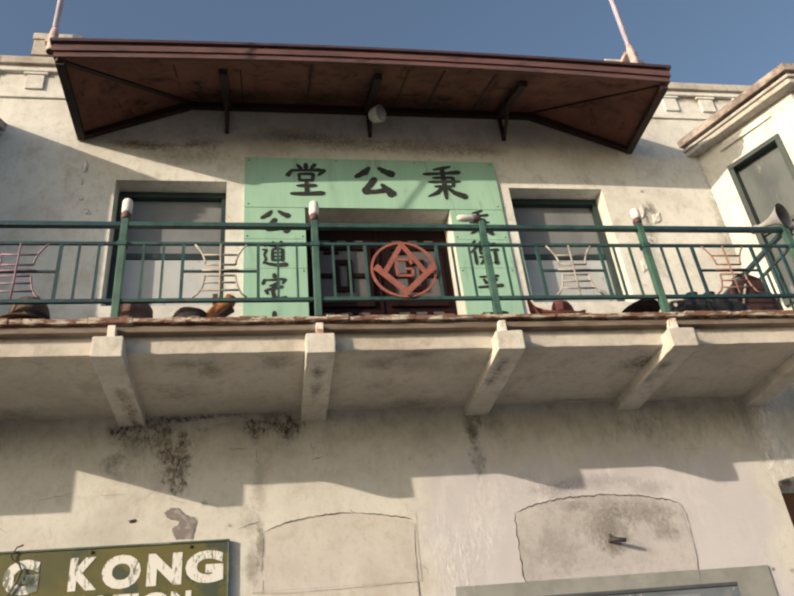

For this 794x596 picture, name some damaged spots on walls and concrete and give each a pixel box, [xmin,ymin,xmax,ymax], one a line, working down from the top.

peeling [164,508,197,540]